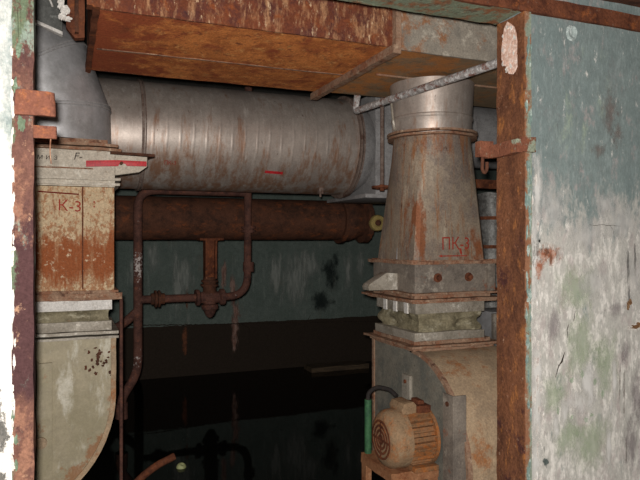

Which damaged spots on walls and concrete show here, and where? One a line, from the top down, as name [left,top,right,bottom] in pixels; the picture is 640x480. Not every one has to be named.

peeling [501,22,518,74]
damp [271,253,350,302]
corrosion [536,248,557,280]
peeling [525,159,545,480]